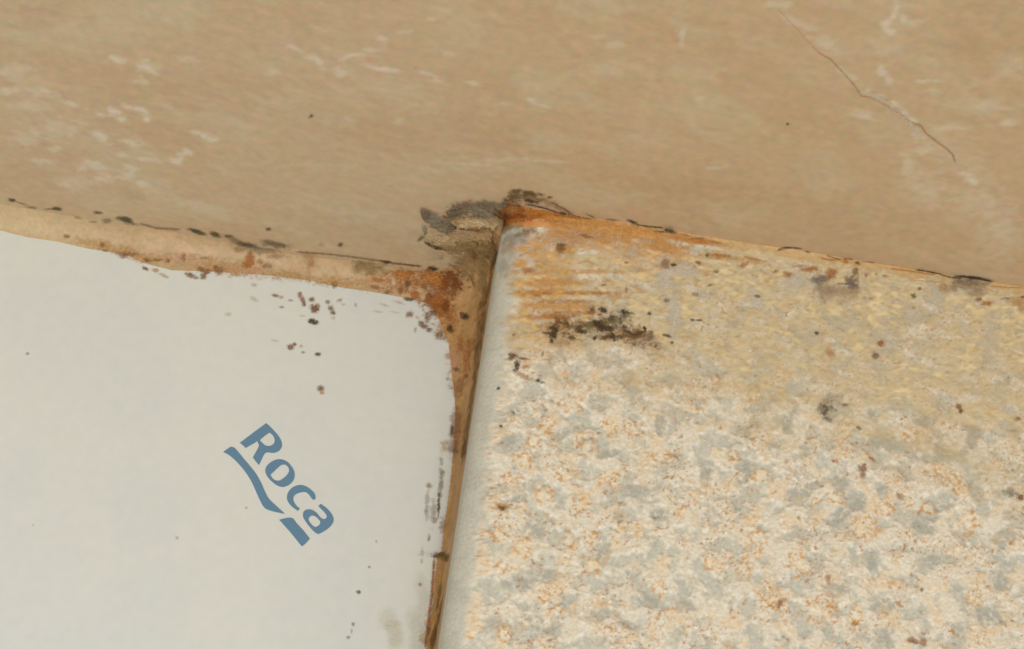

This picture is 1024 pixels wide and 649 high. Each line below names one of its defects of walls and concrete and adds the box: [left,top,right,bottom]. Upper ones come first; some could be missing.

rust [498,205,595,229]
rust [370,263,473,339]
leakage [504,190,1024,427]